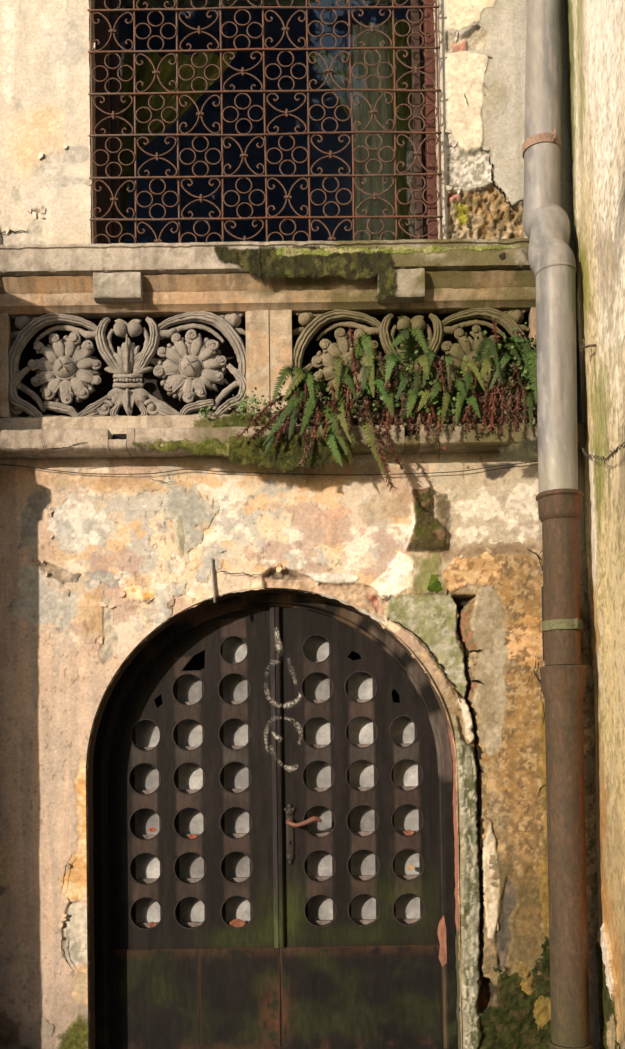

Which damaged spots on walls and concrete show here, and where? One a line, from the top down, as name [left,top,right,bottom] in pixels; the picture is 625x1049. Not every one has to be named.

peeling [444,0,526,239]
leakage [593,203,615,343]
peeling [8,474,225,665]
flaking render [262,563,398,622]
peeling [442,548,506,744]
peeling [504,615,543,667]
crack [388,611,484,980]
peeling [55,758,89,1007]
flaking render [477,875,516,1010]
flaking render [597,923,614,1000]
flaking render [606,1013,616,1049]